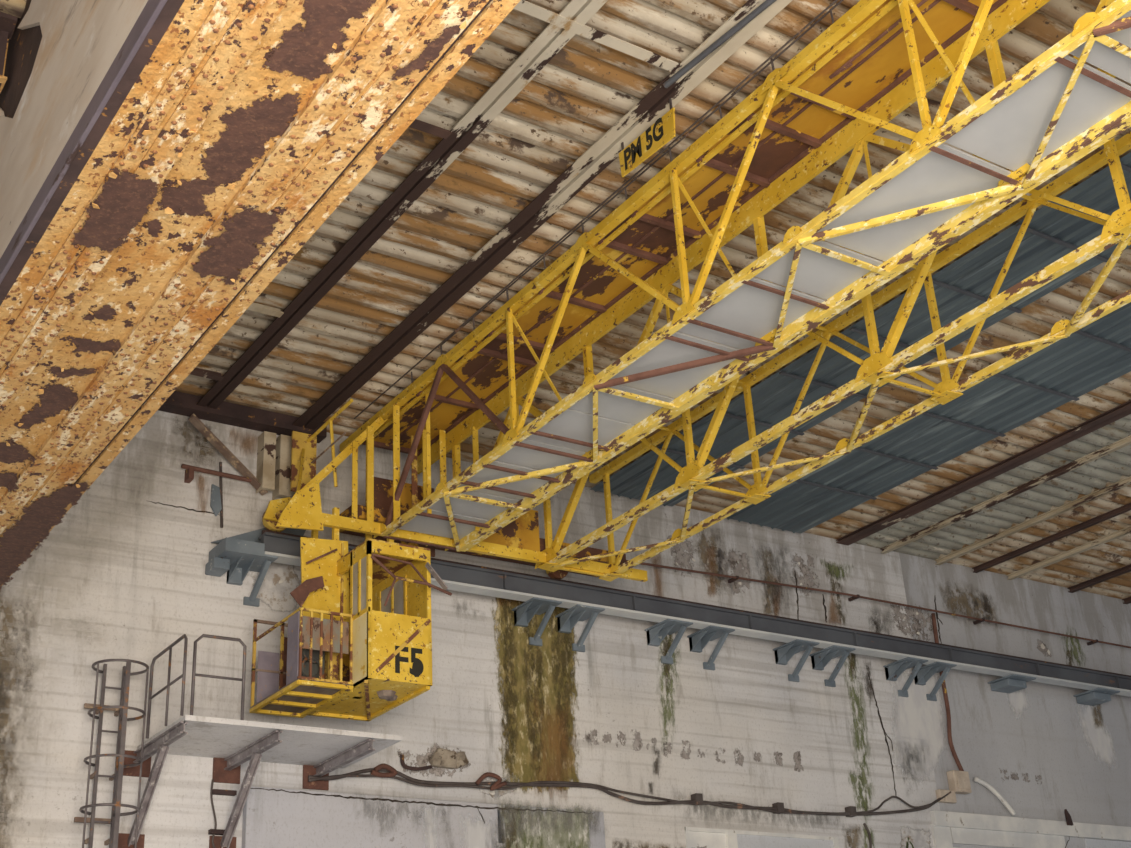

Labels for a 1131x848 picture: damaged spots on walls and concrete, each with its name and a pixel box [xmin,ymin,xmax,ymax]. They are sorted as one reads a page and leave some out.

peeling [262,0,376,81]
peeling [69,93,306,285]
peeling [89,305,118,321]
peeling [0,335,128,493]
peeling [0,482,90,592]
water stain [698,530,722,592]
water stain [821,562,847,578]
water stain [0,600,32,824]
water stain [499,598,574,789]
water stain [848,653,873,698]
water stain [465,807,597,848]
water stain [850,772,867,810]